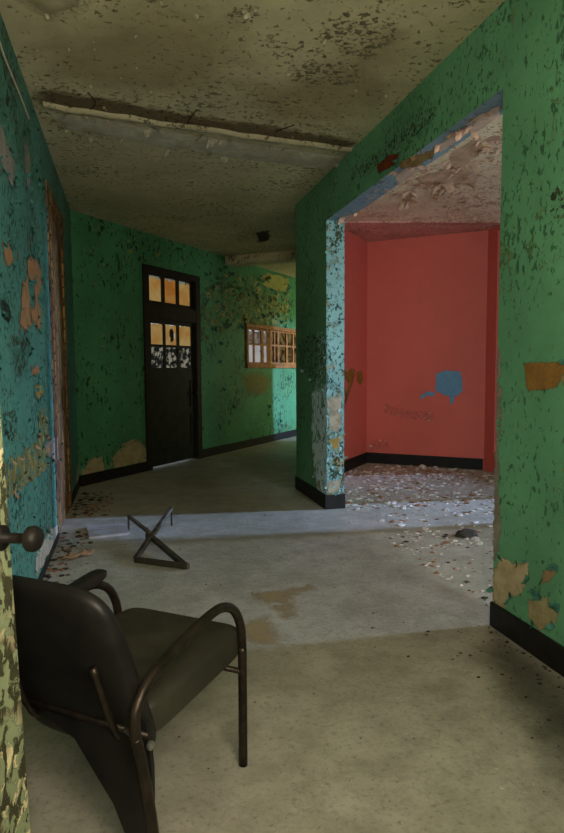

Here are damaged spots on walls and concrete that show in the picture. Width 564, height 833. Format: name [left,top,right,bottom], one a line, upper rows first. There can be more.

peeling [351,101,502,222]
peeling [325,201,383,303]
spalling [0,88,64,576]
spalling [76,439,146,484]
peeling [287,322,348,496]
peeling [420,370,462,404]
spalling [486,348,564,631]